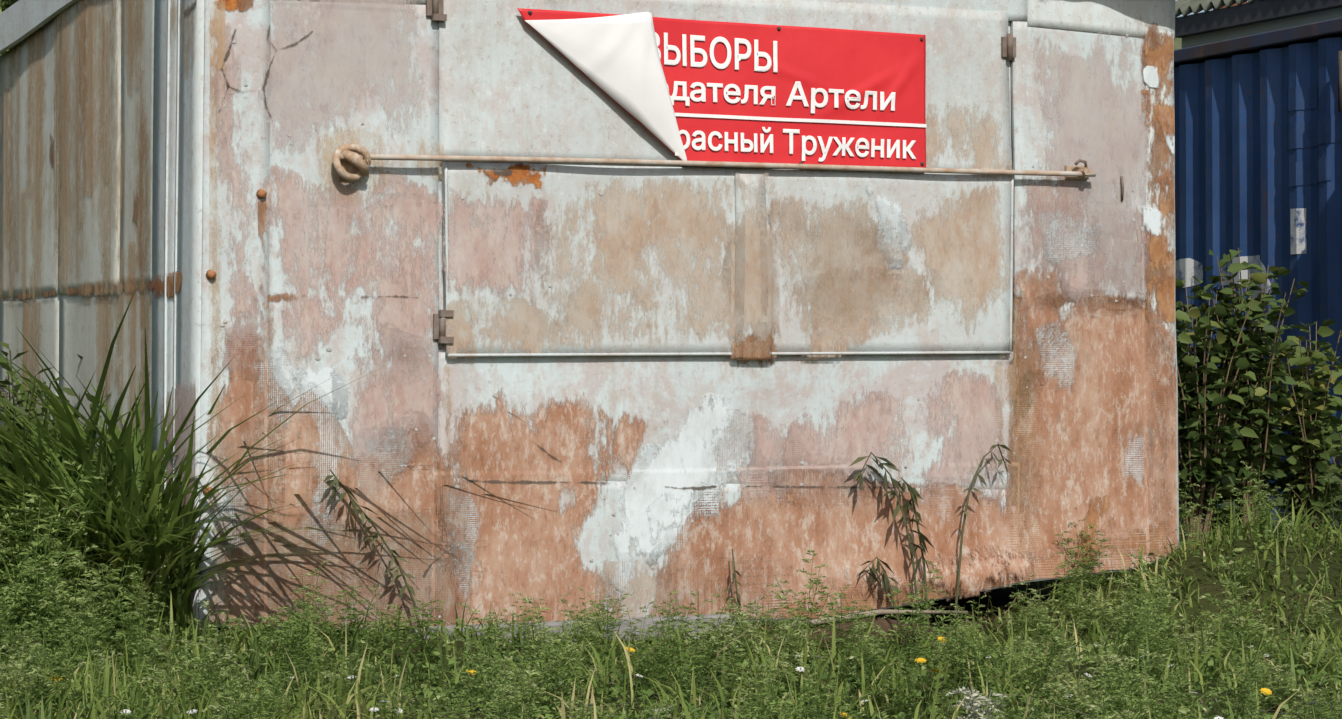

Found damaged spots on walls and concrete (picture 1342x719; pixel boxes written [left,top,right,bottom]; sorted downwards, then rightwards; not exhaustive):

rust [1,0,182,432]
rust [171,0,197,67]
rust [209,0,253,175]
rust [466,162,546,188]
rust [445,297,563,359]
peeling [160,0,1178,628]
rust [722,23,1177,591]
rust [601,560,964,620]